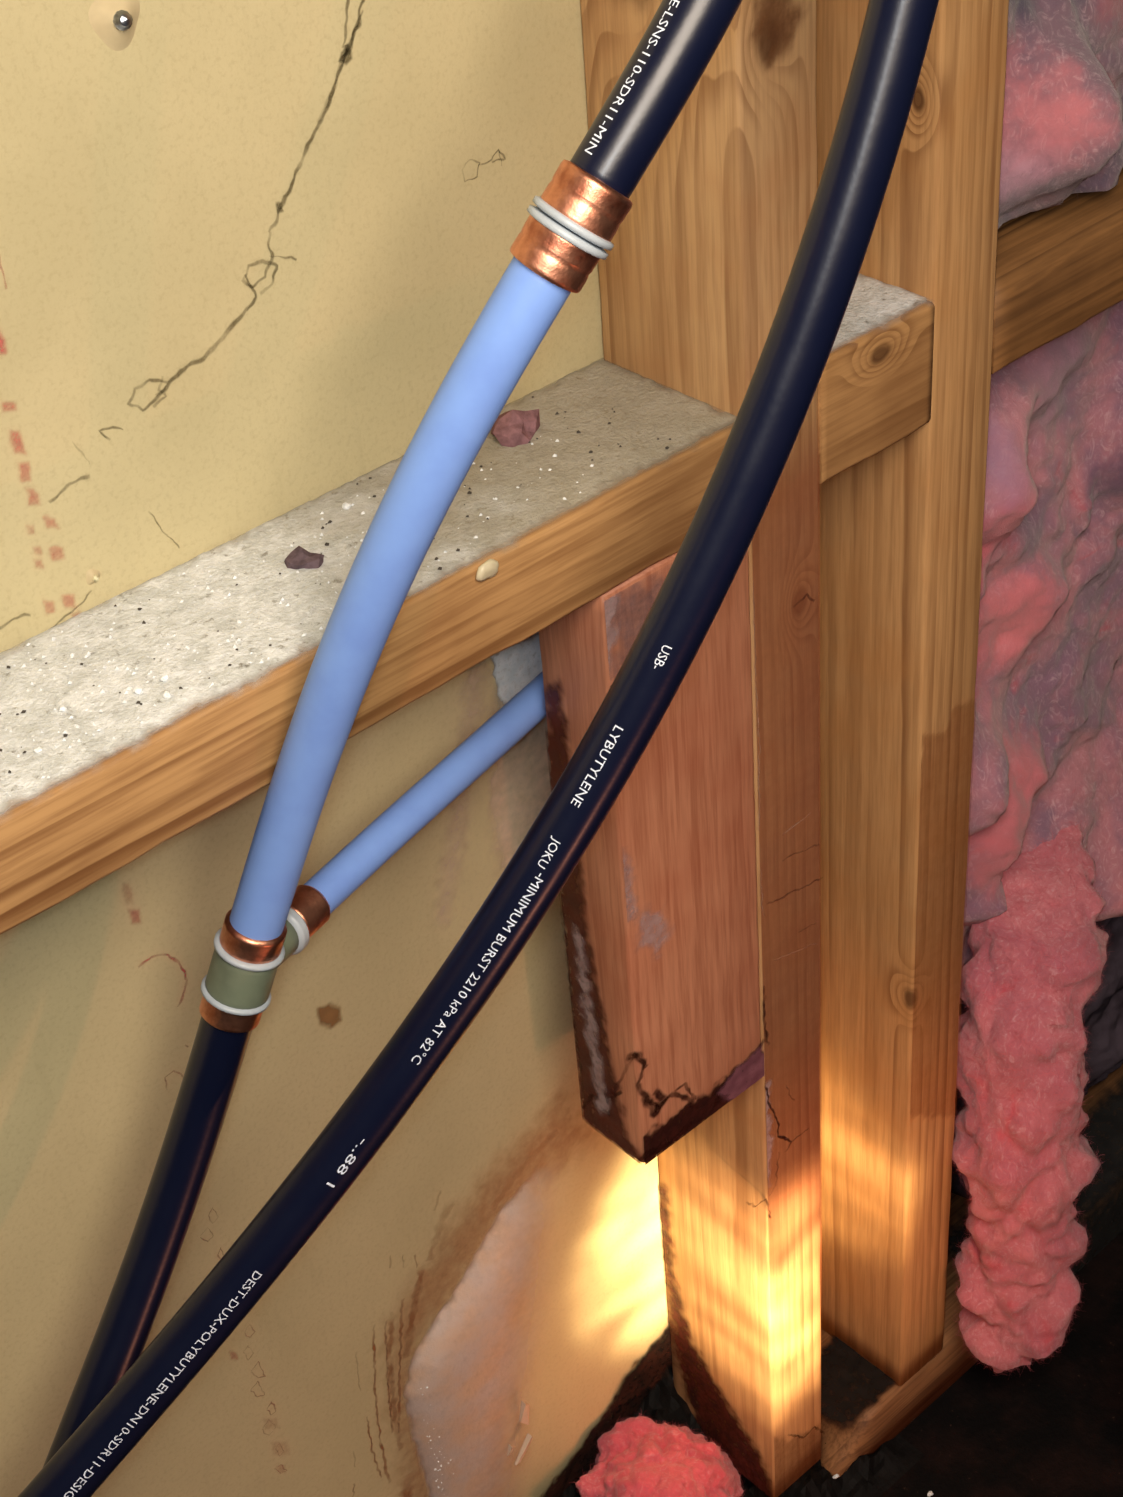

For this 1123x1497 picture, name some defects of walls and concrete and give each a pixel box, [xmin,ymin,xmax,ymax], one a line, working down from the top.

damp [755,0,800,60]
crack [277,0,365,212]
crack [230,247,295,330]
crack [100,357,205,437]